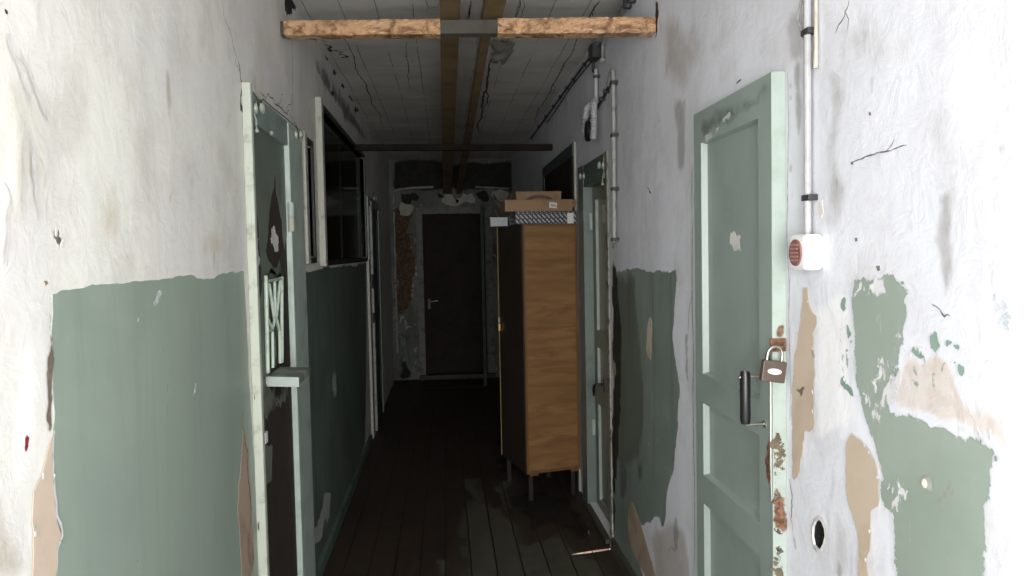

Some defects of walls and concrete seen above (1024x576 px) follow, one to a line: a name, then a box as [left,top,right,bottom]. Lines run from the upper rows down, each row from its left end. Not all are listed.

crack [223,12,293,114]
crack [344,39,382,126]
crack [477,58,492,133]
crack [853,141,905,162]
flaking render [393,202,415,315]
peeling [770,287,817,576]
peeling [840,266,1012,576]
peeling [32,431,63,576]
peeling [237,426,256,576]
peeling [628,501,656,576]
corrosion [765,444,787,531]
spalling [811,515,827,553]